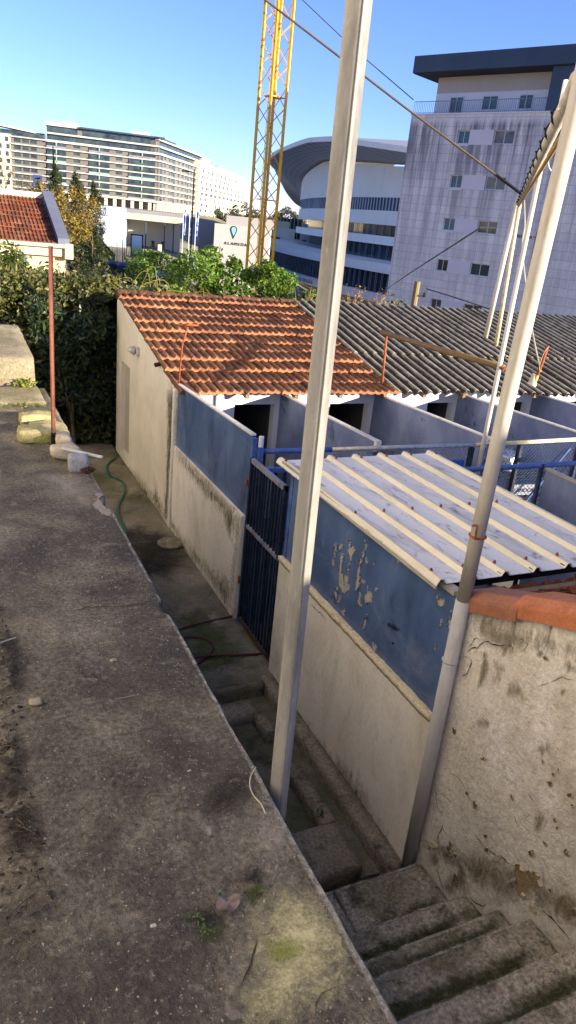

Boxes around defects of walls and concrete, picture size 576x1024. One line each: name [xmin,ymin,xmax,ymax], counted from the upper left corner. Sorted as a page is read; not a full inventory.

peeling [331,539,378,630]
crack [463,637,540,676]
spalling [507,839,553,914]